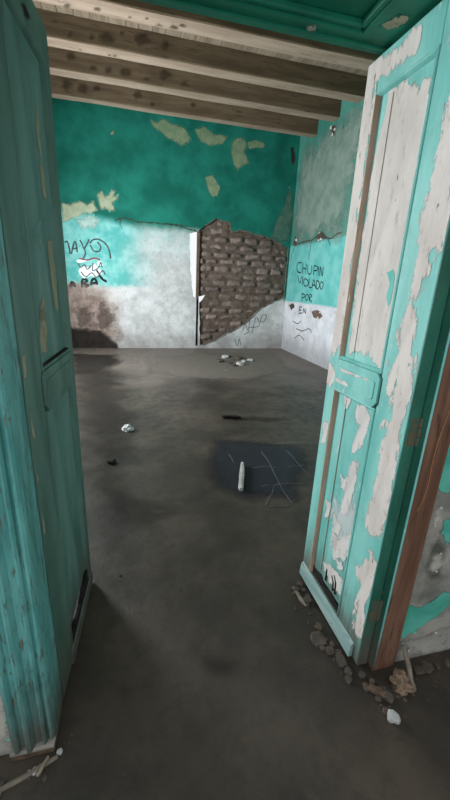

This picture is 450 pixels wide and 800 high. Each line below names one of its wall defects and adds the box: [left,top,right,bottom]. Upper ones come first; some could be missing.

peeling [152,119,265,169]
peeling [62,190,119,221]
crack [115,217,196,231]
crack [290,232,342,260]
damp [68,286,121,338]
peeling [199,15,450,595]
damp [428,543,444,577]
peeling [352,547,377,639]
flaking render [402,627,450,653]